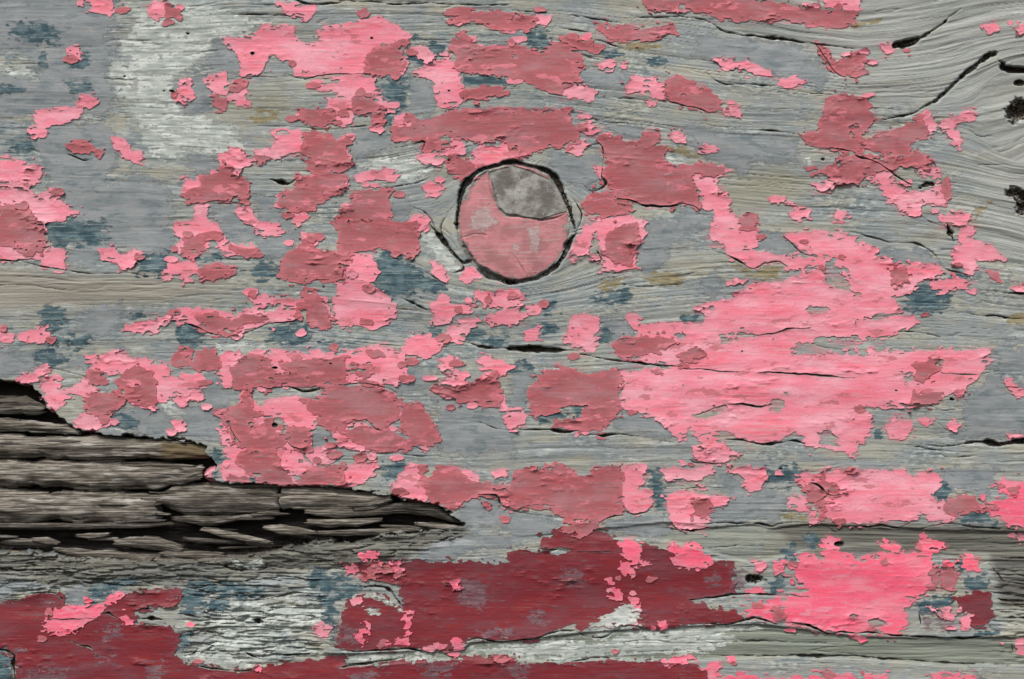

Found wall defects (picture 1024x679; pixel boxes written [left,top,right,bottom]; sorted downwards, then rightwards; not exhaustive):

peeling [637,0,863,30]
peeling [690,30,878,92]
crack [892,11,958,49]
crack [883,52,1024,120]
peeling [798,89,979,217]
peeling [458,164,569,280]
peeling [399,288,559,362]
crack [459,340,673,367]
spalling [0,382,46,404]
spalling [0,408,68,424]
peeling [0,575,683,679]
peeling [916,572,1000,640]